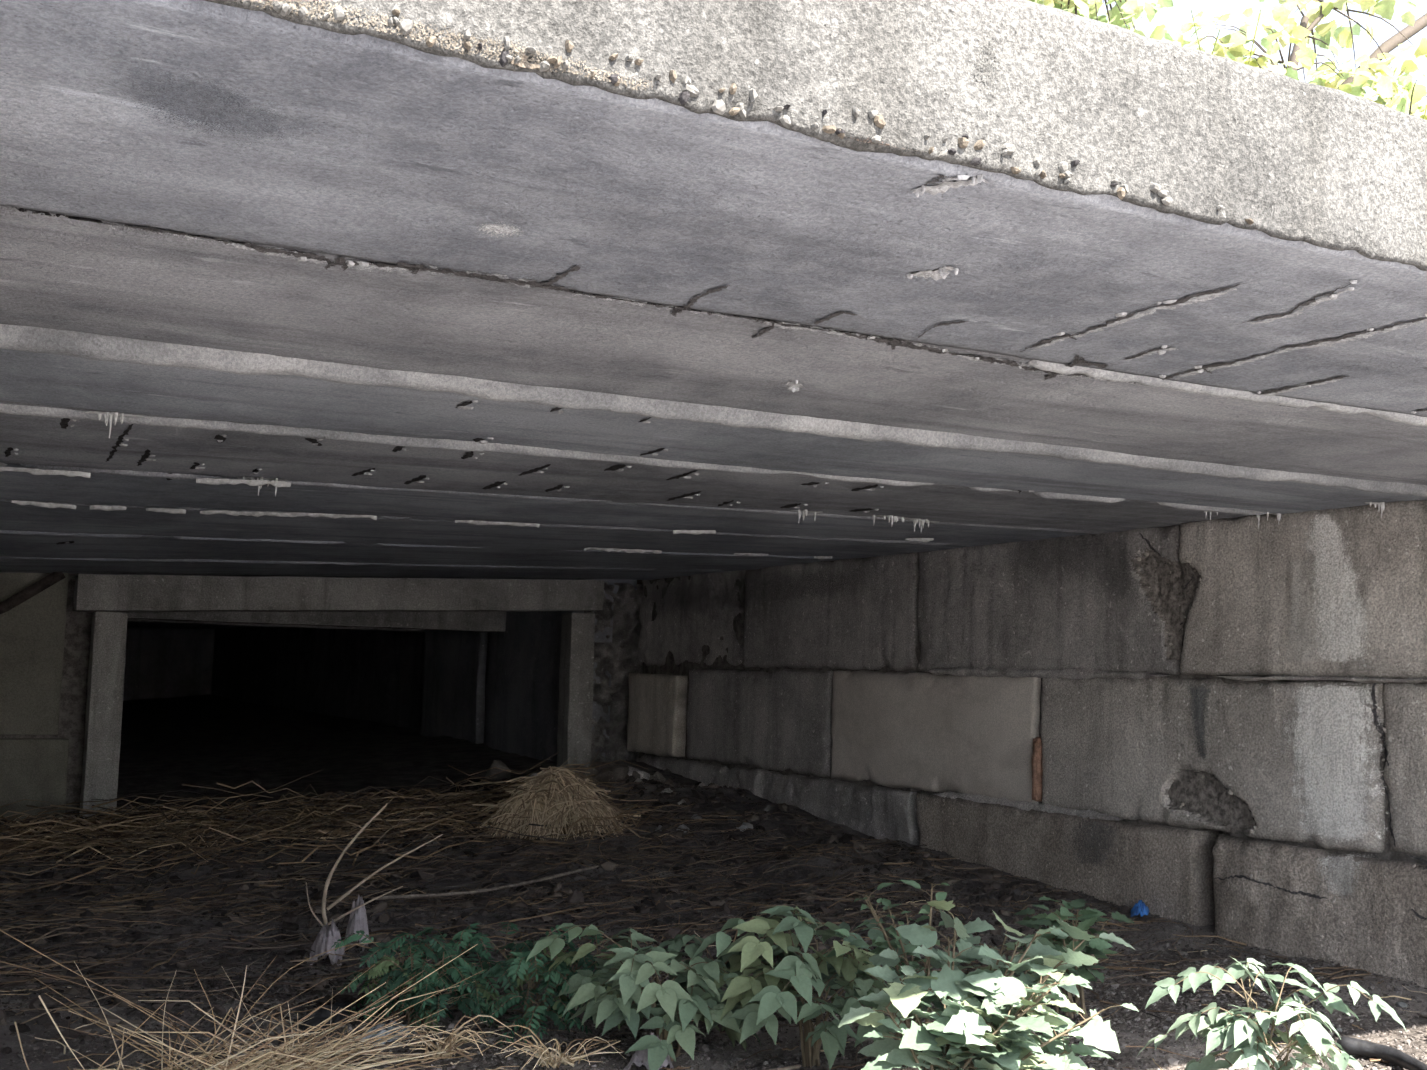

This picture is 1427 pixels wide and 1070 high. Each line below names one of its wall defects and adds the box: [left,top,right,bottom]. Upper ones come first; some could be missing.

crack [7,207,1427,409]
damp [0,466,91,478]
damp [196,478,291,487]
efflorescence [12,500,126,511]
efflorescence [146,508,377,520]
damp [455,520,539,528]
spalling [1130,548,1202,662]
crack [1371,683,1427,870]